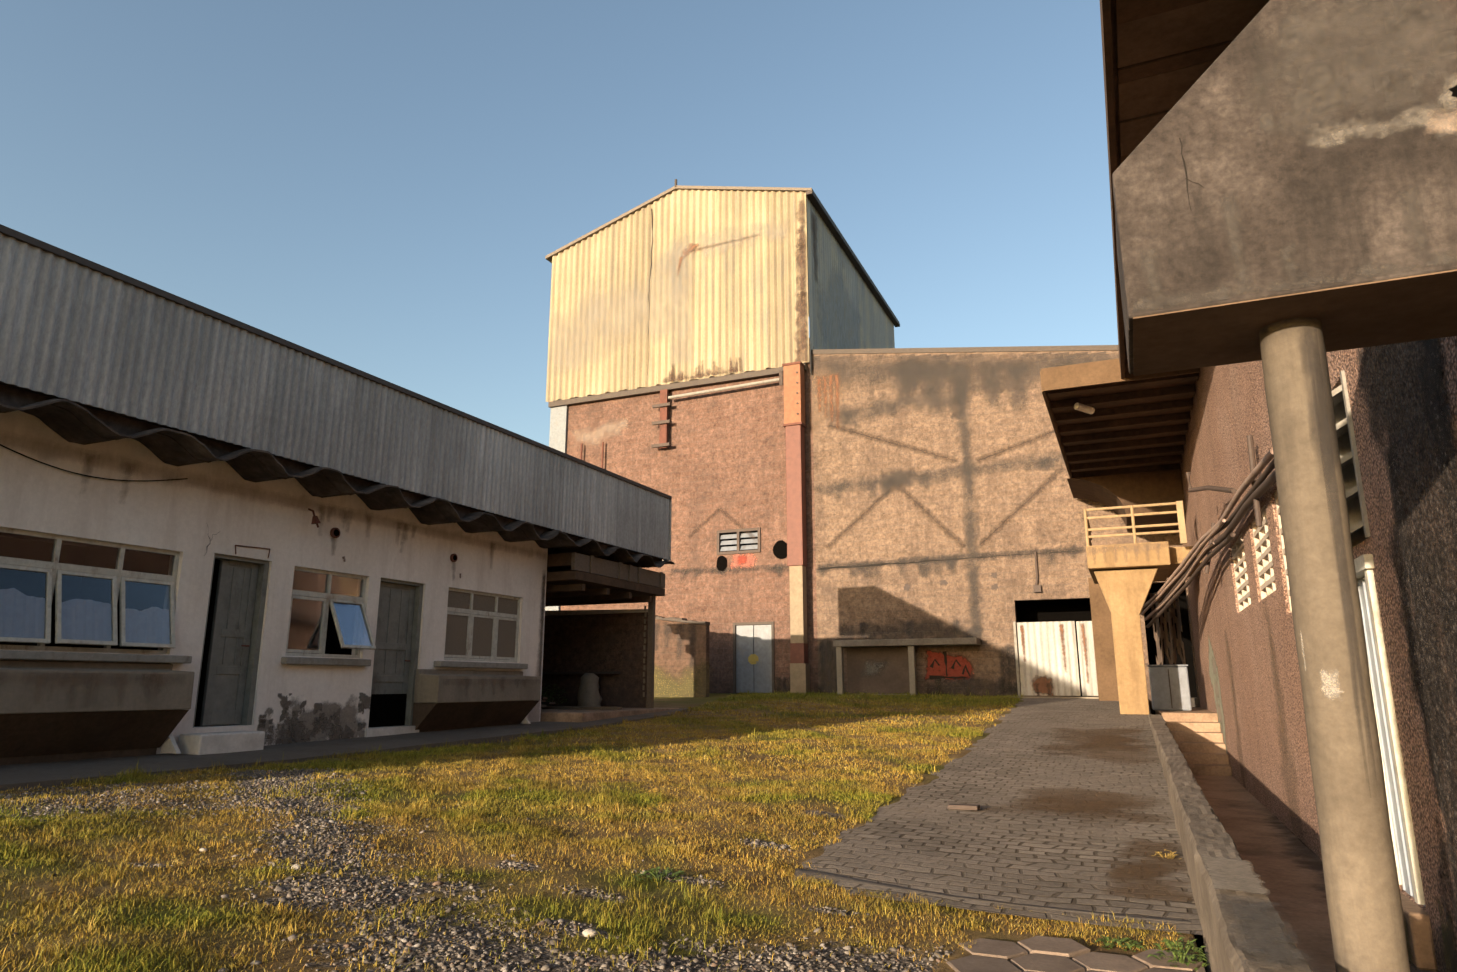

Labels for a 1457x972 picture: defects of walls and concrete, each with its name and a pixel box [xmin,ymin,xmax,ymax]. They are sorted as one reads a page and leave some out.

water stain [1251,0,1457,147]
spalling [1446,76,1457,104]
corrosion [678,244,701,270]
water stain [1133,196,1342,313]
water stain [815,352,1107,386]
water stain [1358,338,1457,972]
peeling [257,693,371,745]